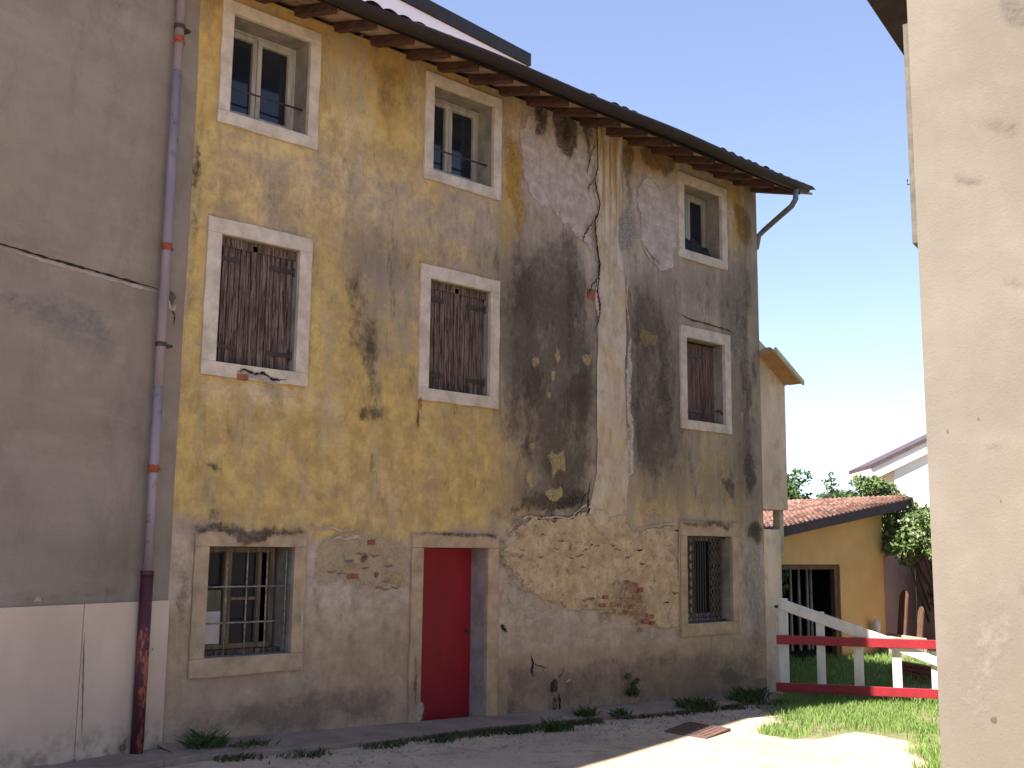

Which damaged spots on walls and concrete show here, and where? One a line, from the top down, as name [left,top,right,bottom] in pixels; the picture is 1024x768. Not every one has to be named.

crack [0,243,159,293]
water stain [509,238,591,516]
peeling [520,115,595,250]
crack [583,131,632,344]
water stain [623,146,674,195]
water stain [625,295,677,474]
peeling [637,178,678,272]
crack [677,312,732,333]
crack [581,482,591,517]
spalling [499,487,682,630]